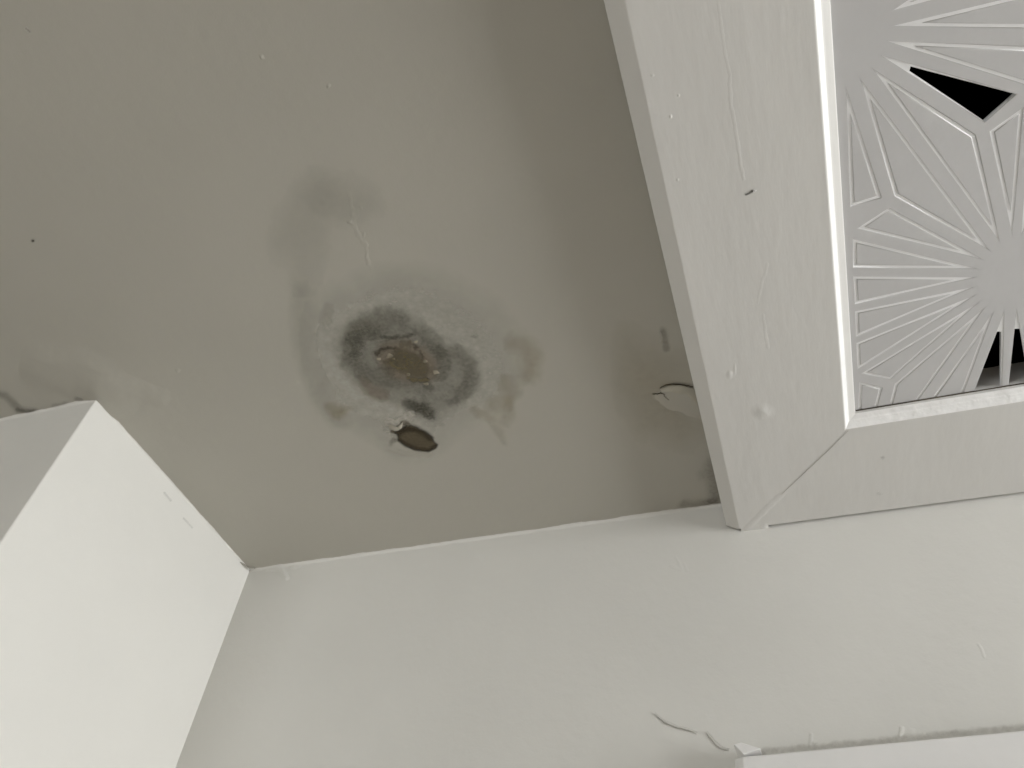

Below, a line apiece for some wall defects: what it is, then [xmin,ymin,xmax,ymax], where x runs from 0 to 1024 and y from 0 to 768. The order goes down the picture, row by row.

water stain [322,315,471,419]
spalling [387,412,438,451]
crack [654,714,729,751]